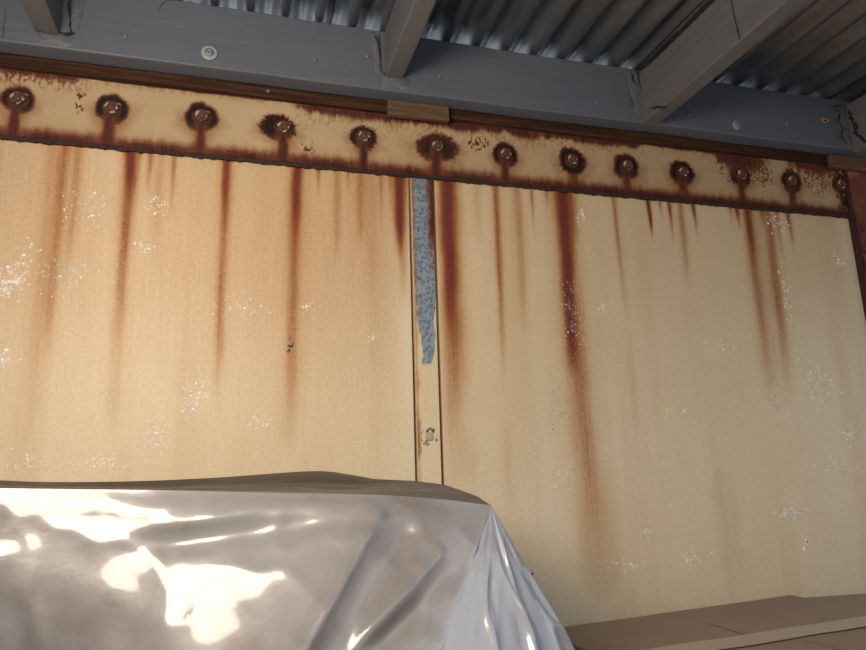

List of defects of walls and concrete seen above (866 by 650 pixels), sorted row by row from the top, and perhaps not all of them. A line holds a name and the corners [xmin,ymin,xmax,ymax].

crack [835,105,866,144]
peeling [412,178,436,365]
corrosion [0,68,866,463]